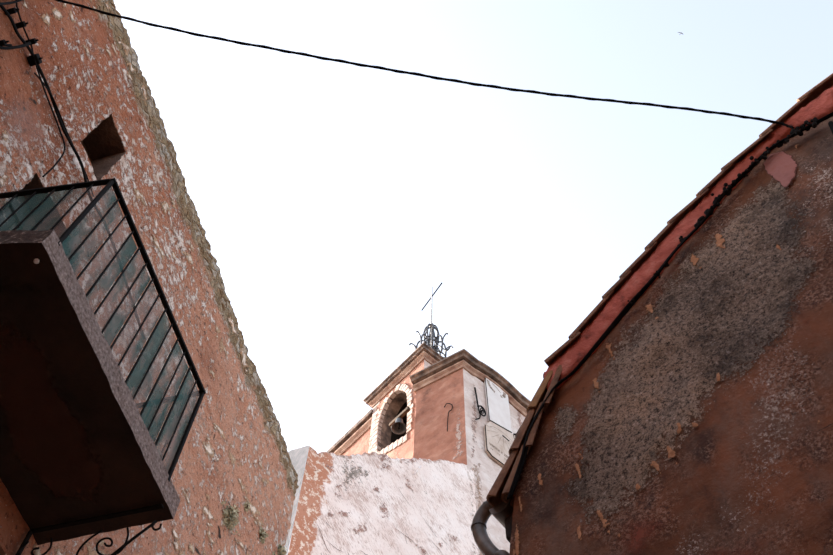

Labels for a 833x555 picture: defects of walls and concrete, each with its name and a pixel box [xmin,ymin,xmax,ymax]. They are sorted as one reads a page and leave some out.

peeling [41,3,76,26]